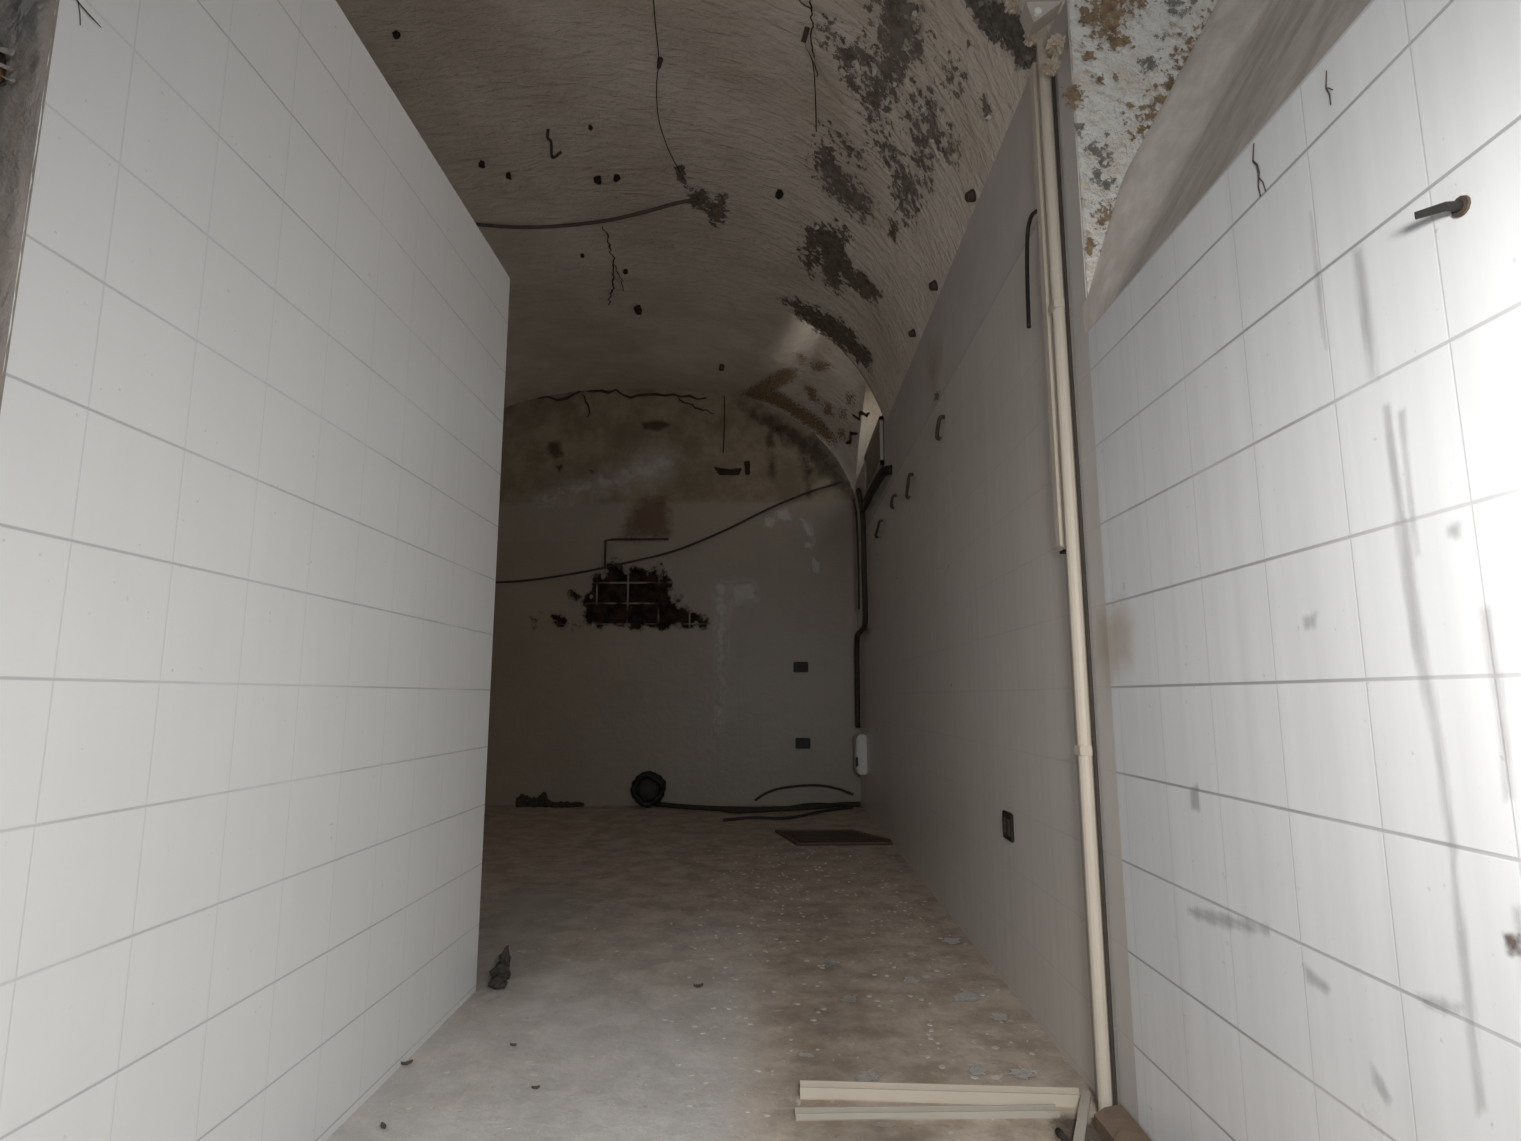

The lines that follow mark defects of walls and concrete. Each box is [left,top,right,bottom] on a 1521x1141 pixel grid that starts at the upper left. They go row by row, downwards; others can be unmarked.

flaking render [796,0,1036,310]
flaking render [780,294,873,372]
water stain [737,354,856,495]
flaking render [531,557,709,631]